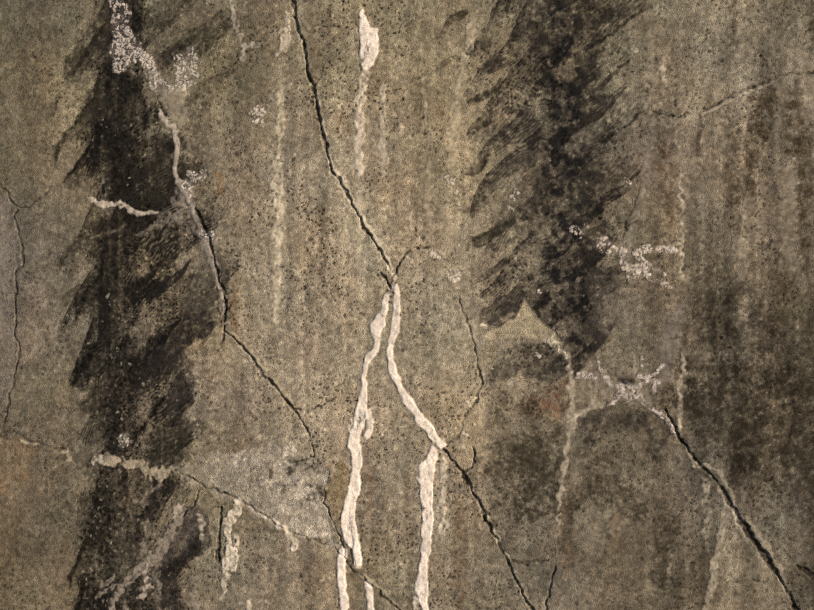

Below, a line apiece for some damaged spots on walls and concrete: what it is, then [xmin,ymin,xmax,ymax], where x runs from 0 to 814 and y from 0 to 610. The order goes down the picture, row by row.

crack [0,181,74,453]
damp [22,0,302,610]
crack [195,202,337,465]
crack [178,474,404,610]
damp [299,186,328,354]
crack [289,0,499,287]
crack [439,296,557,610]
damp [336,0,814,610]
crack [621,10,810,276]
crack [663,408,814,610]